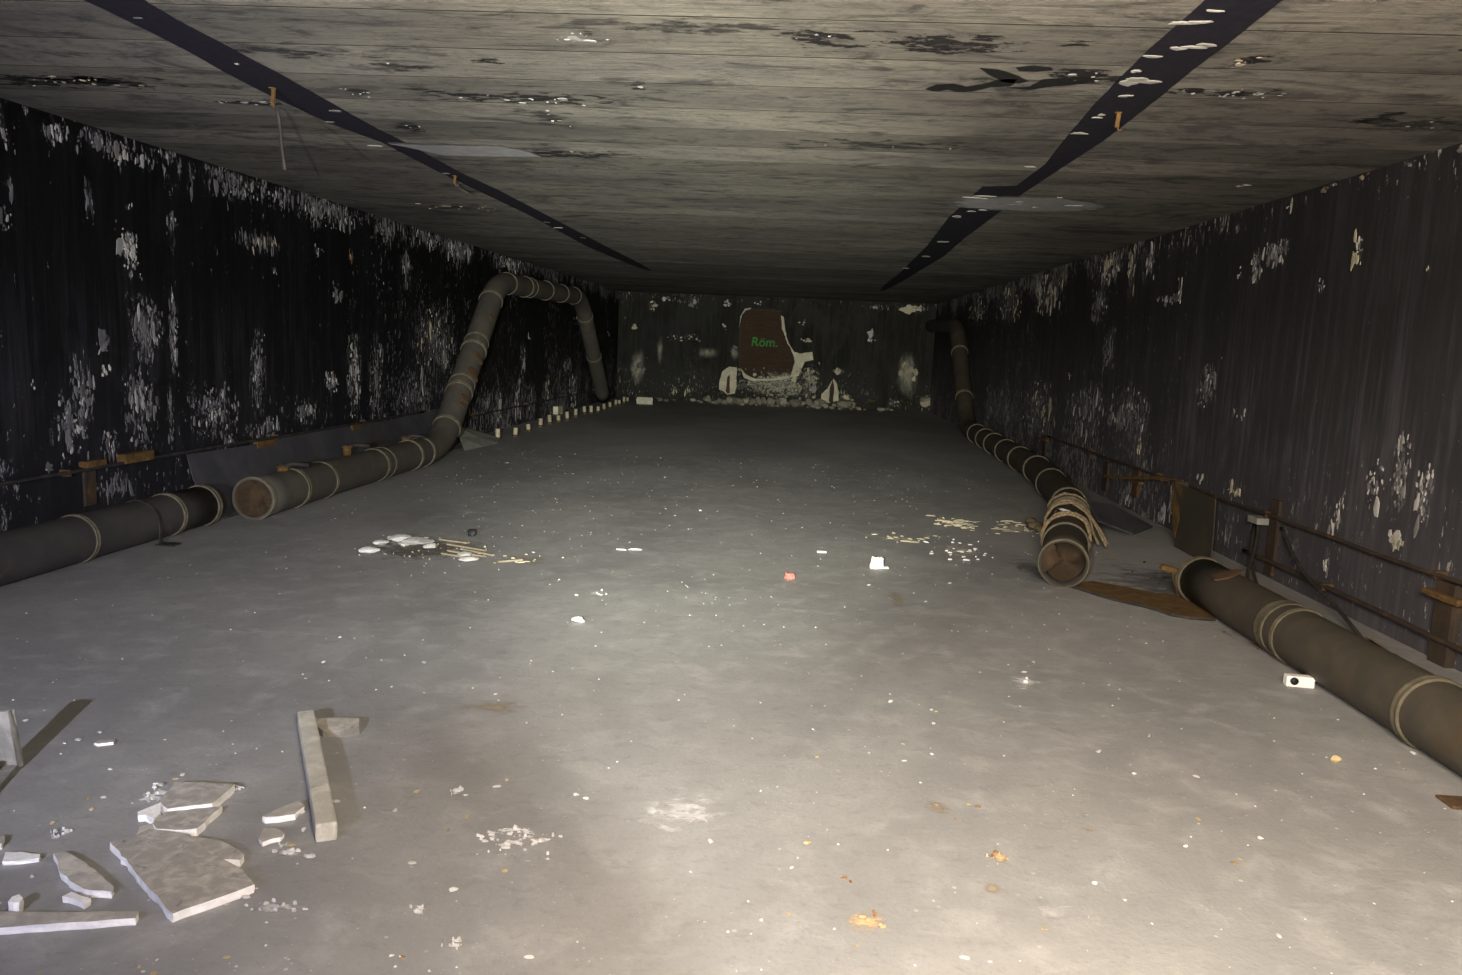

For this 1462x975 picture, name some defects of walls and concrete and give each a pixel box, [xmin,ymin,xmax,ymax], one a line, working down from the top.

peeling [0,114,16,155]
peeling [205,164,392,257]
peeling [116,227,164,367]
peeling [45,328,120,474]
peeling [1366,432,1434,551]